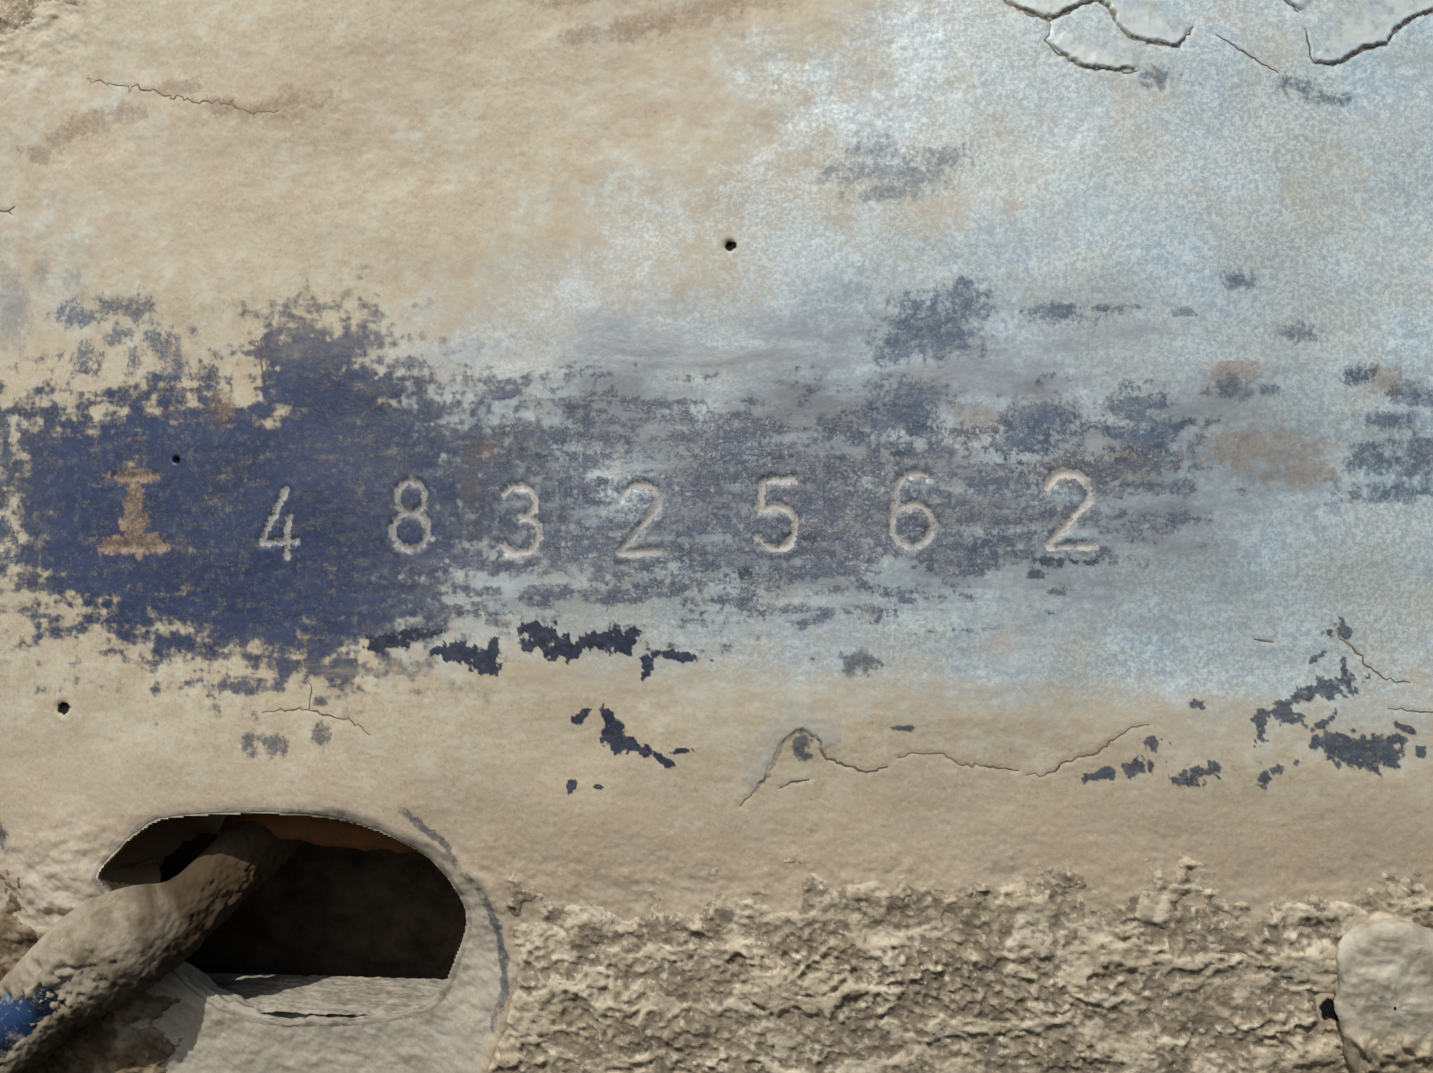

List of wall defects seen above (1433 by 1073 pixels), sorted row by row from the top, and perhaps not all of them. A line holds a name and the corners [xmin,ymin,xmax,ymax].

crack [1003,0,1279,74]
crack [1284,0,1433,66]
crack [87,78,278,114]
peeling [1348,379,1433,504]
peeling [0,276,1212,705]
peeling [1250,617,1426,775]
crack [1335,630,1433,713]
peeling [566,779,603,794]
peeling [571,703,693,768]
crack [739,724,1150,806]
peeling [1081,736,1170,784]
peeling [1171,760,1221,787]